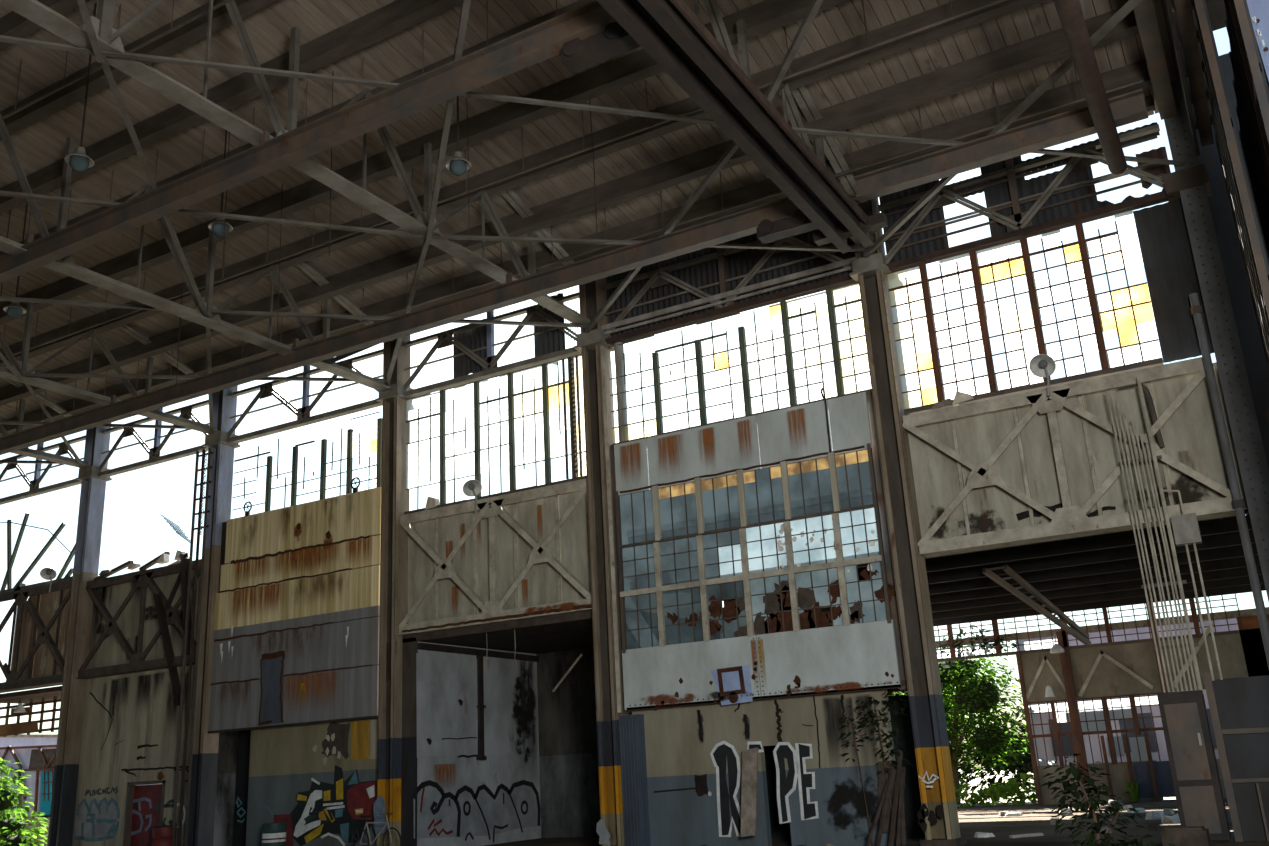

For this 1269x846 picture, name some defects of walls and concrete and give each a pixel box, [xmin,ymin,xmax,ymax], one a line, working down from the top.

rust [658,435,680,462]
rust [700,428,714,454]
rust [620,443,865,493]
rust [738,420,750,446]
rust [788,409,805,435]
rust [219,523,370,609]
leakage [104,673,187,715]
rust [210,622,373,726]